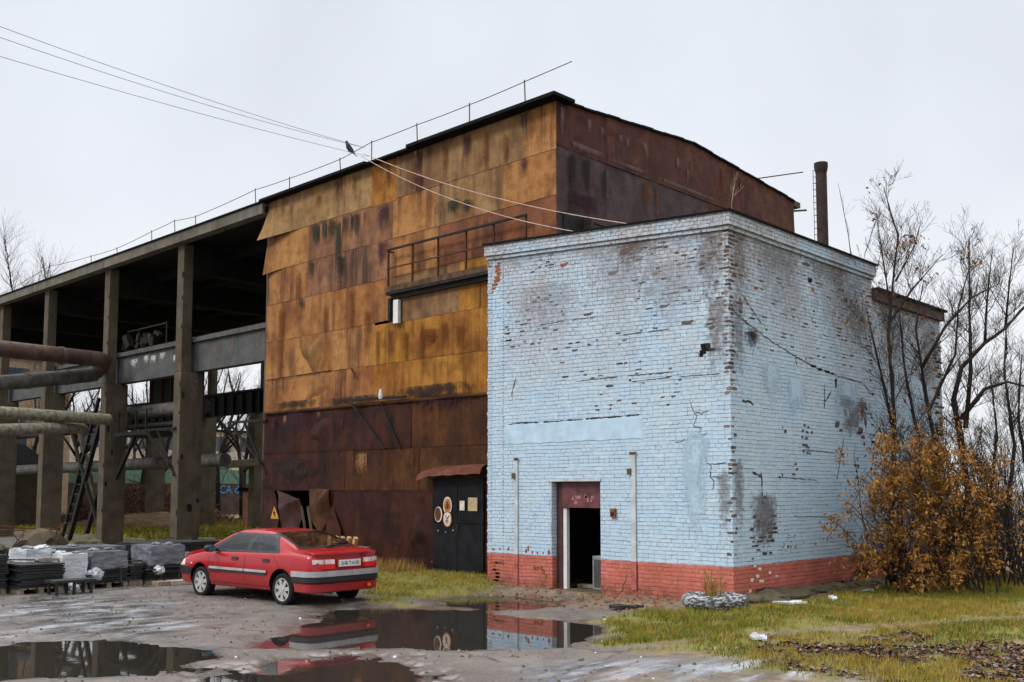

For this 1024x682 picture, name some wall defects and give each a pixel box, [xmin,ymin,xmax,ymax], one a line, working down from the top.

peeling [504,292,565,348]
peeling [616,229,768,394]
crack [734,297,870,408]
crack [576,348,725,489]
peeling [724,417,738,478]